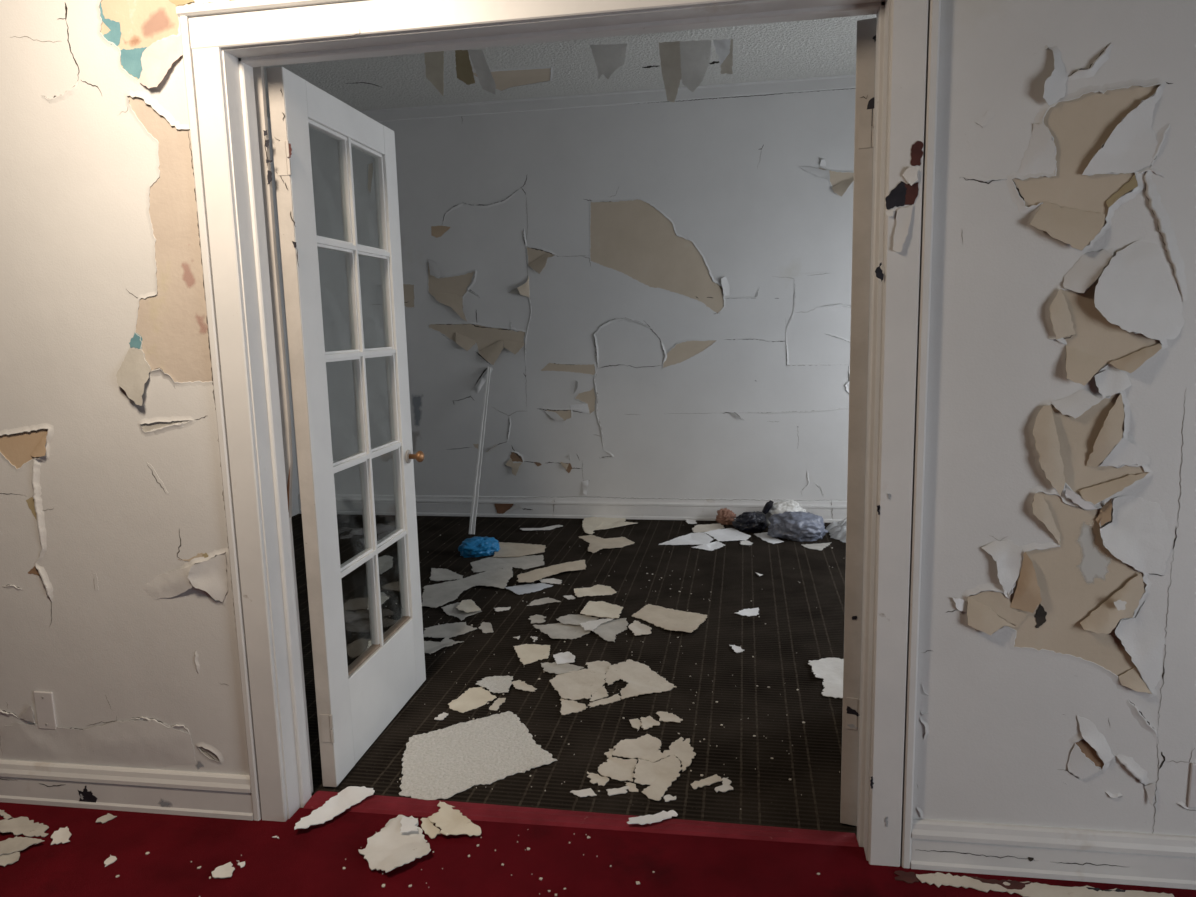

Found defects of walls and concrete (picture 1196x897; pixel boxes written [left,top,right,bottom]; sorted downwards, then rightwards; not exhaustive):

crack [14,3,102,104]
peeling [95,0,233,436]
peeling [263,130,292,191]
peeling [403,259,528,365]
crack [431,175,532,450]
peeling [509,187,726,315]
crack [445,272,851,518]
peeling [885,141,924,252]
peeling [946,43,1185,698]
peeling [0,423,54,627]
peeling [142,534,231,606]
peeling [1057,716,1114,779]